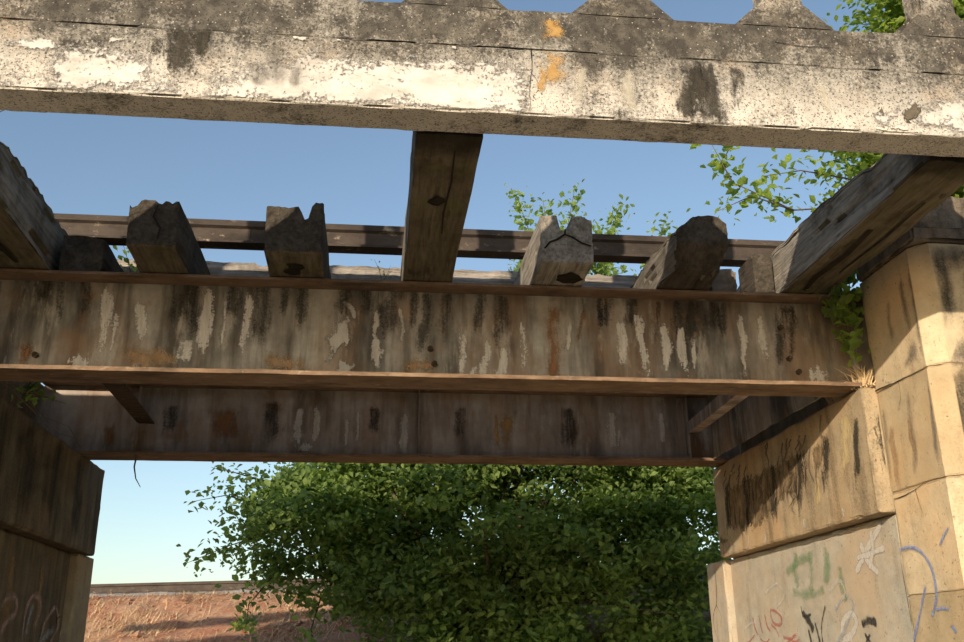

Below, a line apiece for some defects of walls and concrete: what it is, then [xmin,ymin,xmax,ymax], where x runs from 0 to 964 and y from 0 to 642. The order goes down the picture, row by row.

leakage [146,29,212,76]
rust [538,54,565,91]
rust [546,19,562,37]
leakage [676,61,745,121]
leakage [170,285,308,362]
leakage [334,290,398,338]
leakage [410,292,452,348]
leakage [458,294,529,375]
rust [547,309,559,376]
leakage [956,374,964,432]